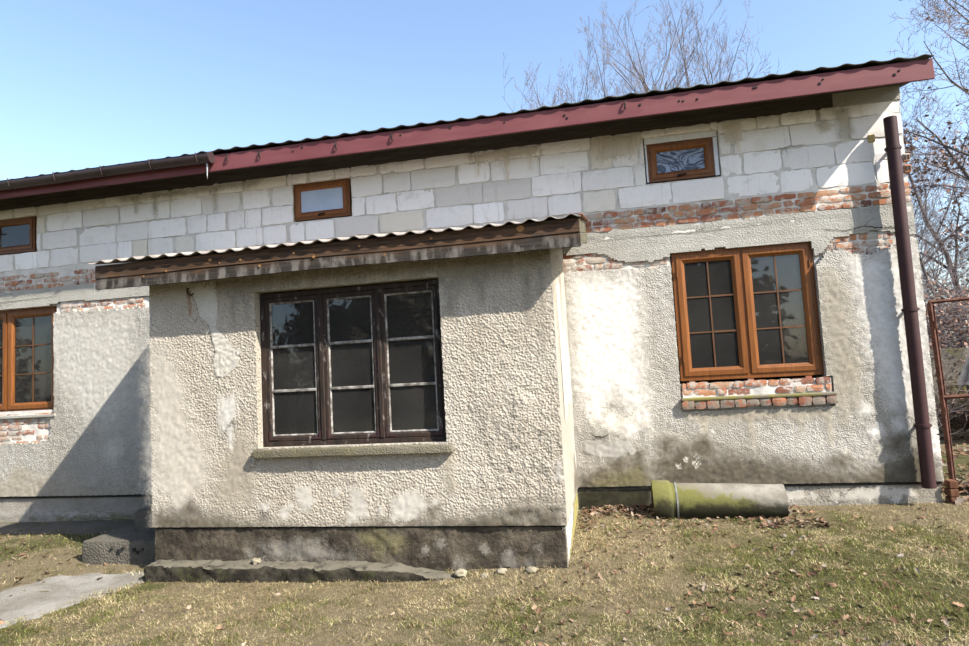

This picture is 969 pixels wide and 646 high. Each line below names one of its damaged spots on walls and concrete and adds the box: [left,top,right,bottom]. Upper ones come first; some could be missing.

crack [828,217,890,233]
flaking render [186,282,241,377]
flaking render [0,409,54,445]
water stain [220,440,250,496]
water stain [574,409,921,510]
water stain [151,496,303,528]
water stain [346,501,565,527]